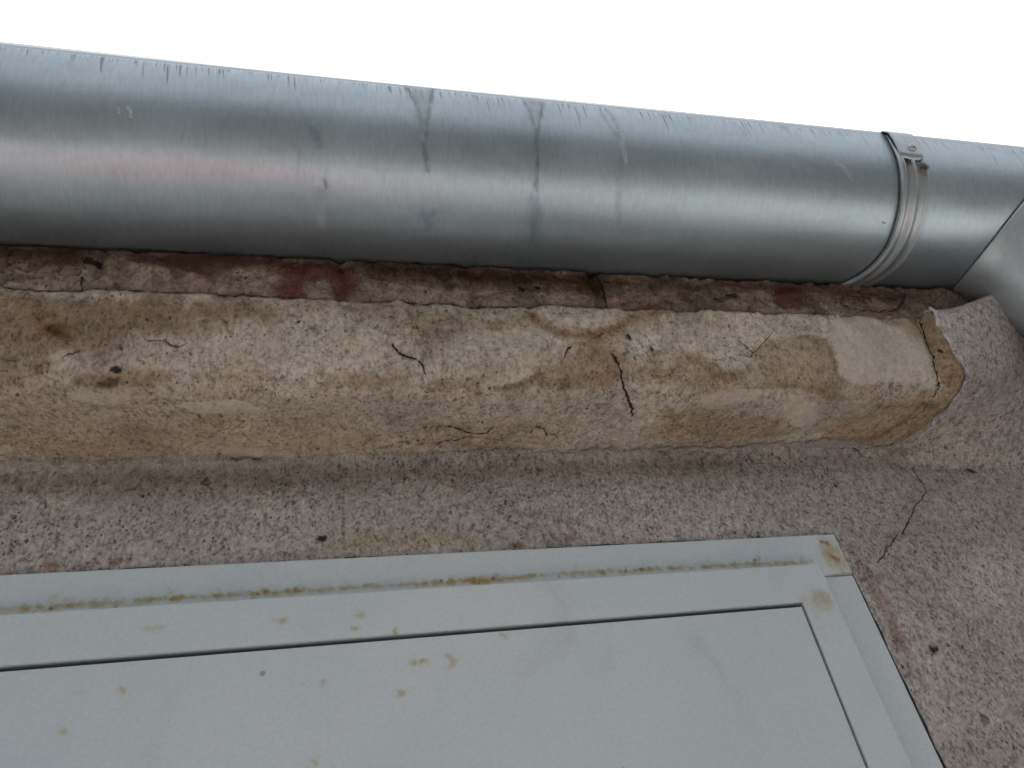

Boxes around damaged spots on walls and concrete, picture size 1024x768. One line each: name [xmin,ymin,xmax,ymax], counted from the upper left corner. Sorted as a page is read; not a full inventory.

crack [392,343,425,374]
crack [611,353,634,416]
crack [905,323,940,423]
crack [877,469,927,563]